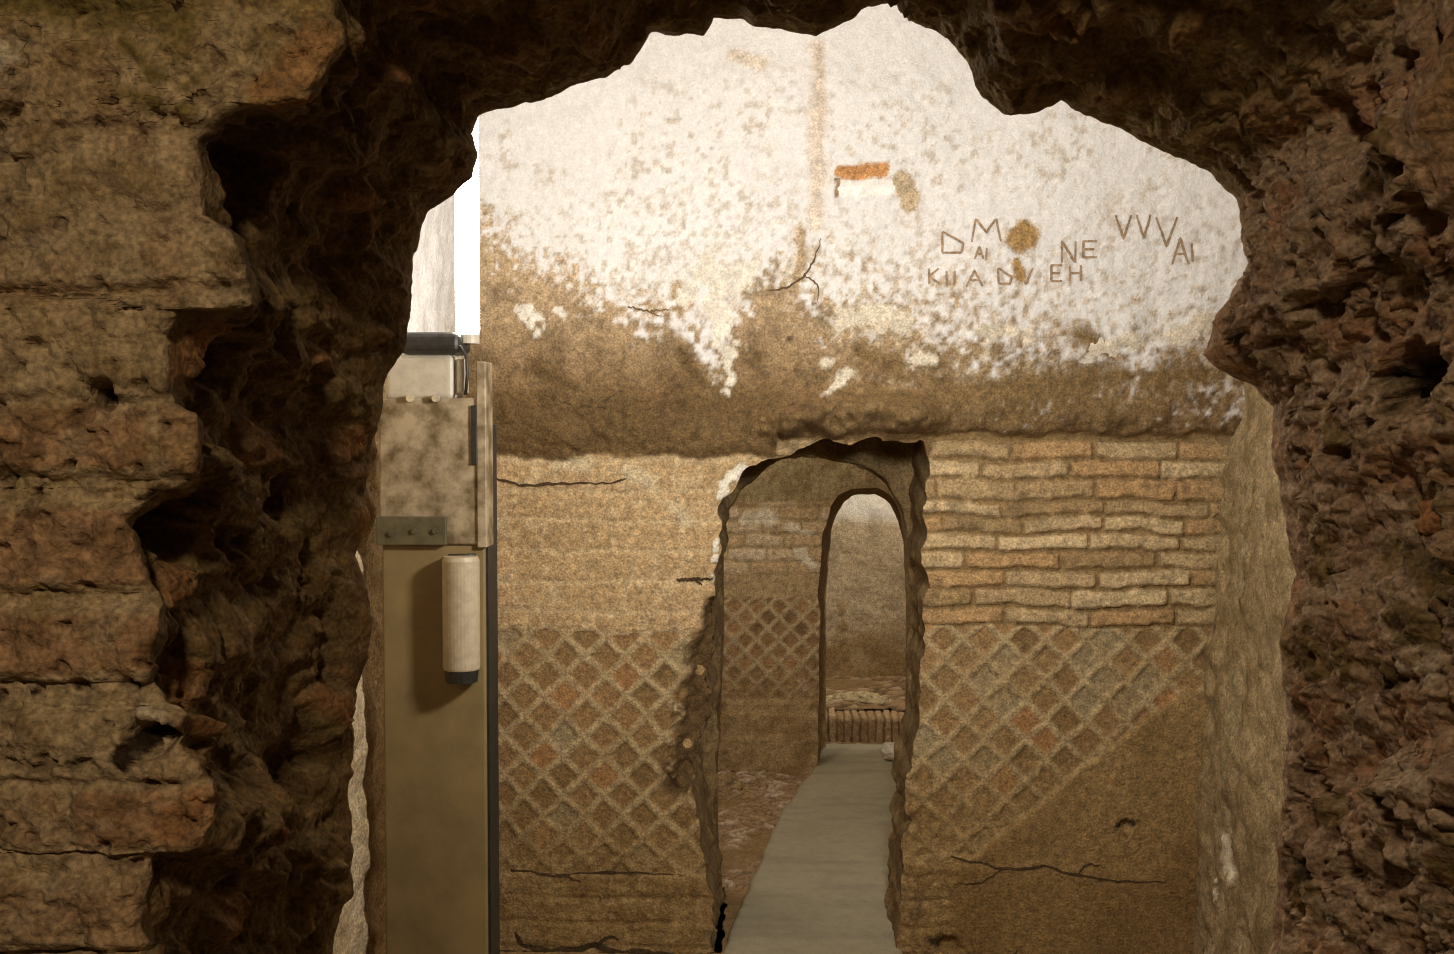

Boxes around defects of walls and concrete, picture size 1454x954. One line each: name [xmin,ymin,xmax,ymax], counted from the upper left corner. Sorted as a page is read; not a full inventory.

spalling [832,161,924,216]
peeling [510,302,568,339]
peeling [673,232,766,398]
peeling [817,298,942,398]
peeling [972,315,1040,350]
peeling [1076,299,1218,364]
crack [951,856,1166,885]
crack [514,932,674,954]